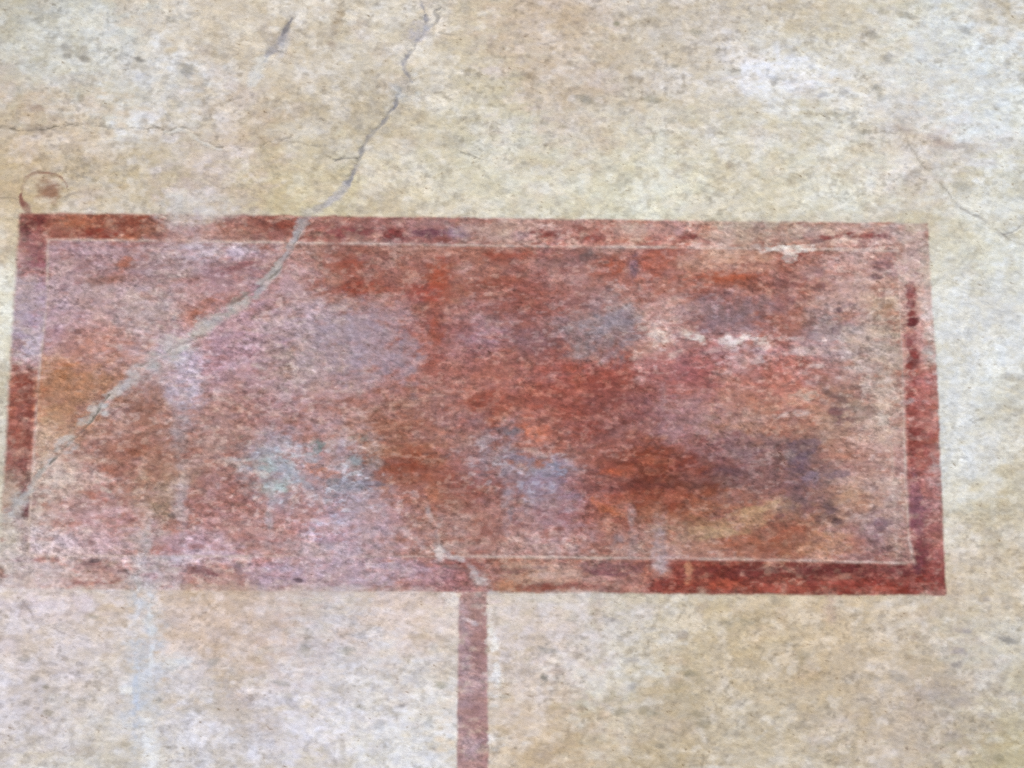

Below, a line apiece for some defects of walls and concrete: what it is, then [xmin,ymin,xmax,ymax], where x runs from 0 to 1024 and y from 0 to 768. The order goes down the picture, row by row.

crack [0,0,458,530]